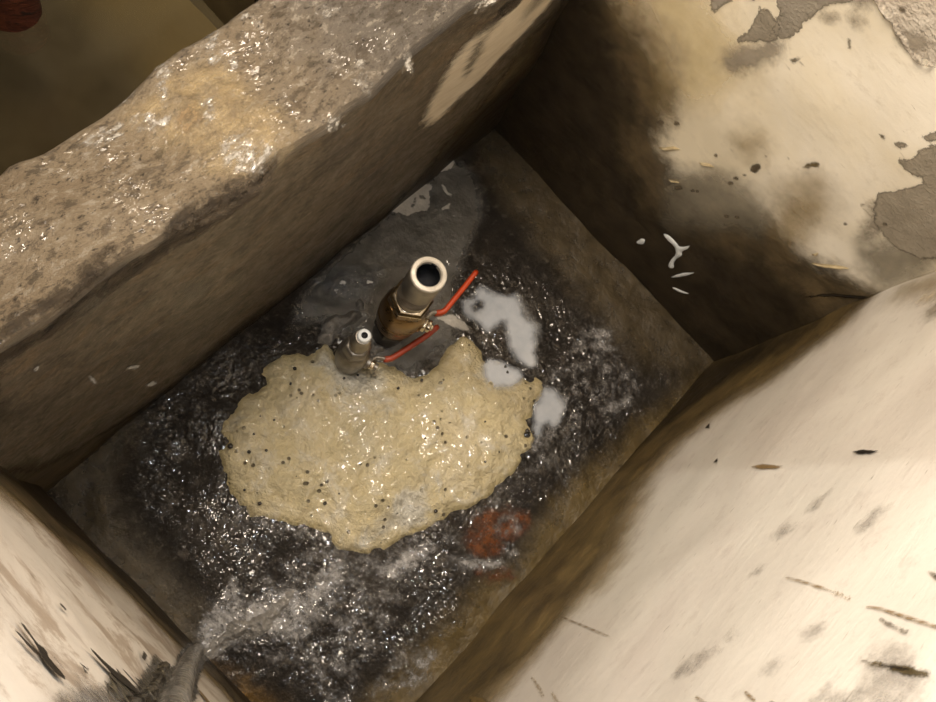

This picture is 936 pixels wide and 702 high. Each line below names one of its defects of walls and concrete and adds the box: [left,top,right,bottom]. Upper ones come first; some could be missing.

water stain [83,124,123,146]
water stain [135,33,272,172]
peeling [423,0,551,126]
peeling [710,0,732,13]
peeling [725,0,853,71]
peeling [862,132,936,283]
water stain [286,0,878,702]
water stain [0,301,282,648]
rust [453,510,529,580]
spalling [15,623,65,679]
water stain [198,564,345,702]